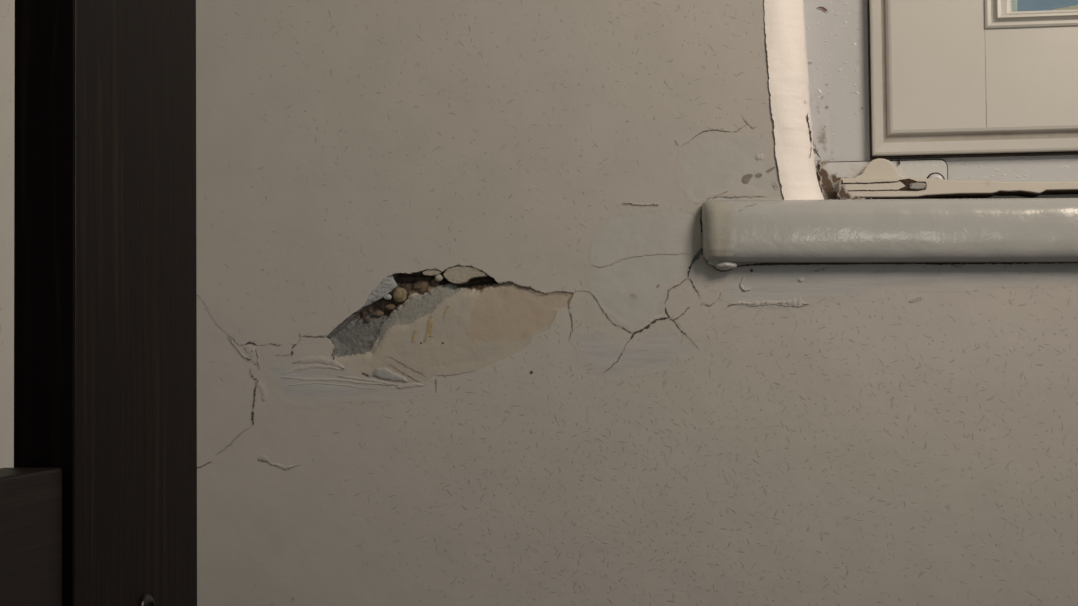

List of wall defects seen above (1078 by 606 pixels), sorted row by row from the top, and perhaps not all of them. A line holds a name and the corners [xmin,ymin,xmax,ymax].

crack [197,295,327,468]
flaking render [282,264,574,391]
crack [575,191,1078,374]